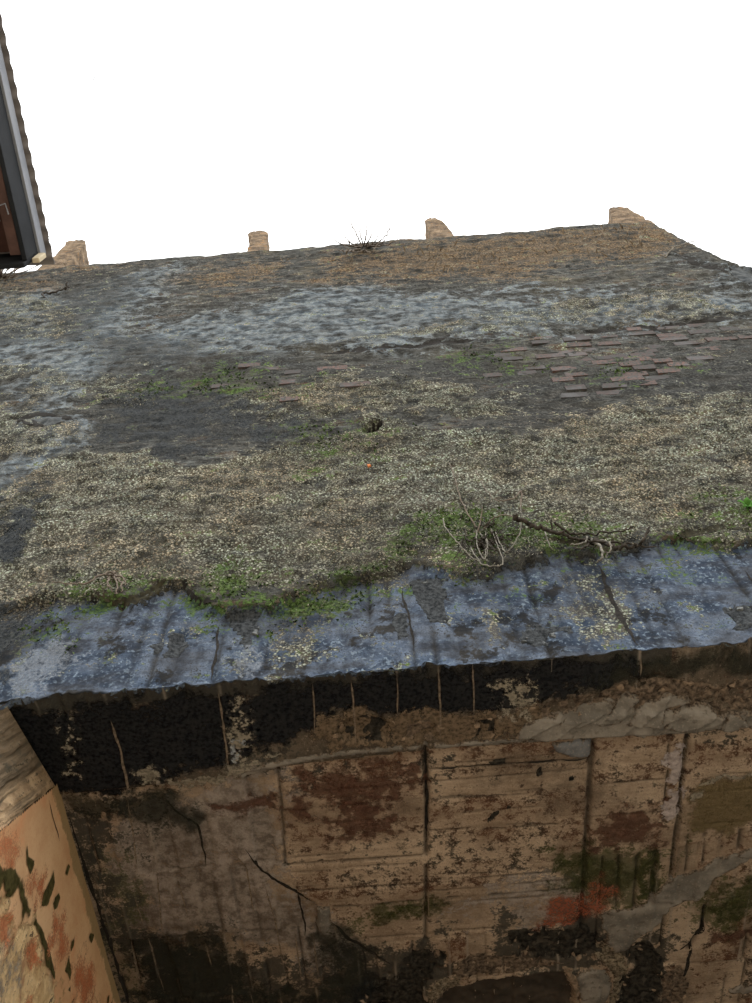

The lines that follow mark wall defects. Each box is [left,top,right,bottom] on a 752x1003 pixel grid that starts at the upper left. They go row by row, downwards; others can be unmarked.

damp [77,381,302,460]
damp [0,480,53,563]
damp [9,643,752,836]
crack [187,818,206,864]
crack [50,806,130,1003]
damp [117,923,386,1003]
crack [247,852,314,933]
crack [333,923,392,984]
spalling [360,919,604,1003]
crack [680,908,705,980]